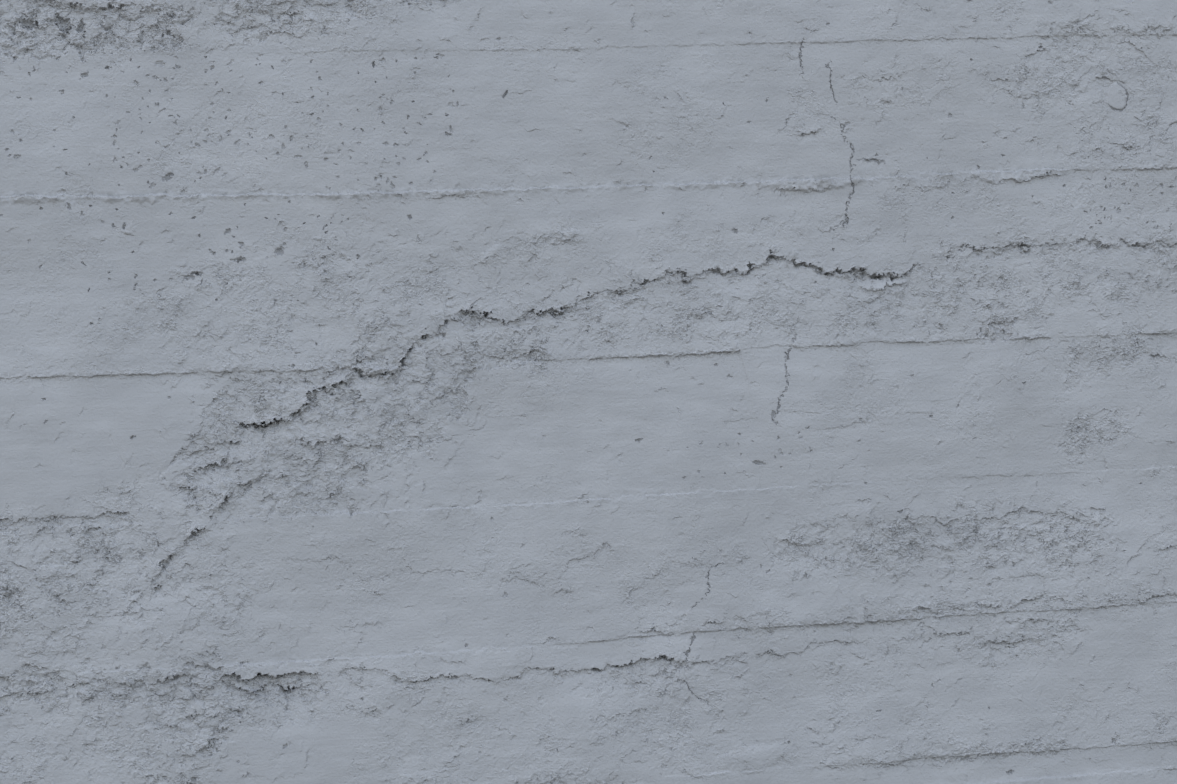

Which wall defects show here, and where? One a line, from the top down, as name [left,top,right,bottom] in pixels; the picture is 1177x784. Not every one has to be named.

spalling [0,0,449,75]
crack [75,235,1177,621]